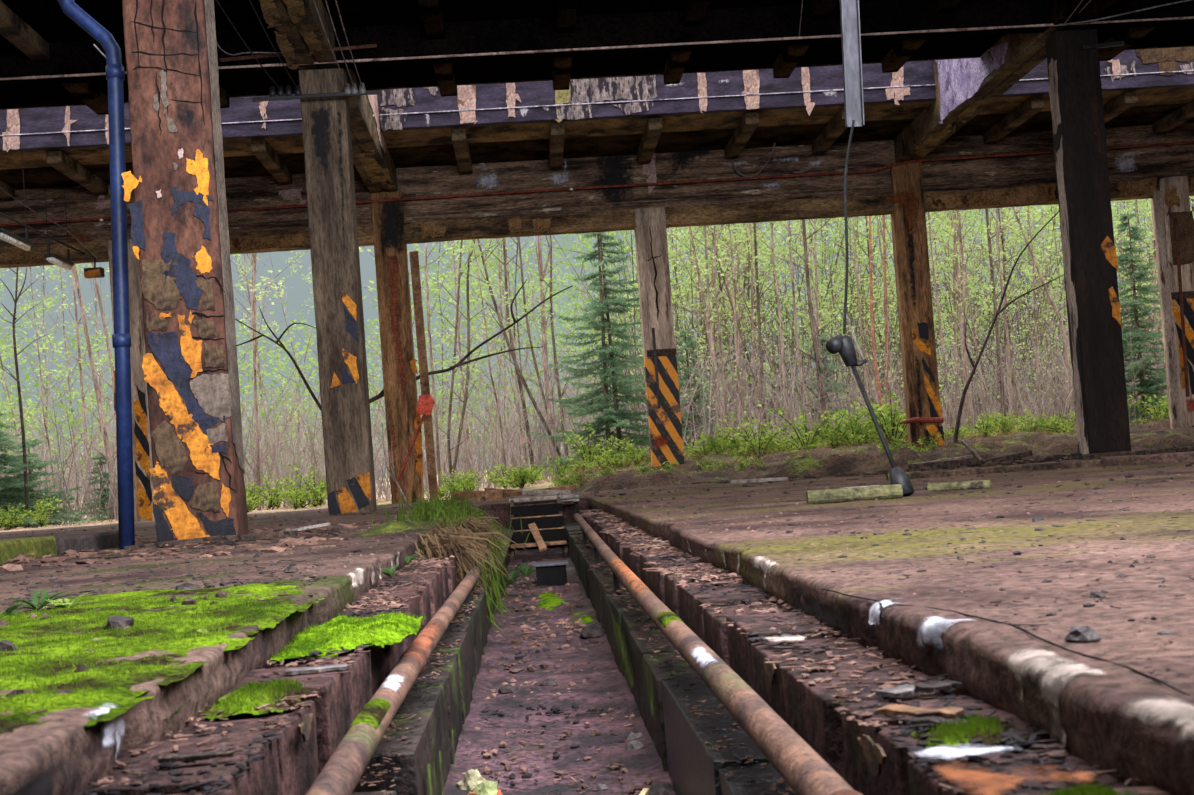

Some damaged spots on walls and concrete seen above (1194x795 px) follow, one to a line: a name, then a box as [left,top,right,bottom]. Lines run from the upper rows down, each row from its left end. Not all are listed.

crack [131,0,205,136]
peeling [457,85,477,124]
peeling [555,75,658,123]
peeling [697,73,707,113]
peeling [742,70,760,109]
peeling [801,67,815,116]
peeling [1104,47,1194,83]
peeling [2,109,20,152]
peeling [94,0,307,546]
crack [646,225,661,319]
rust [610,559,647,593]
rust [399,622,441,660]